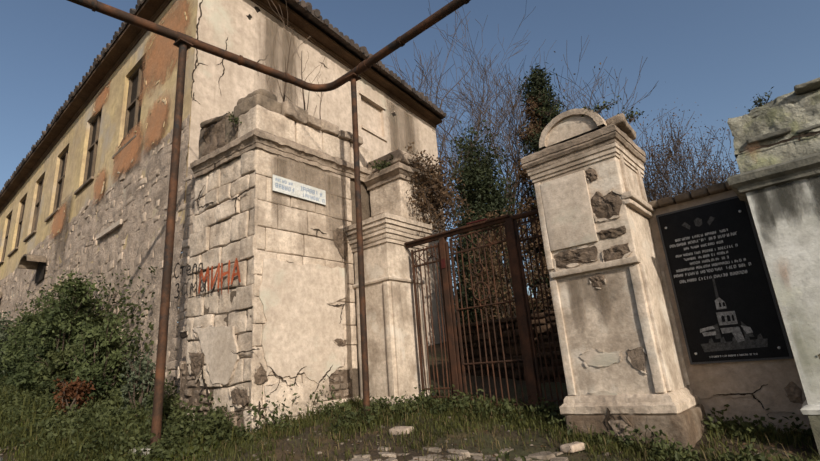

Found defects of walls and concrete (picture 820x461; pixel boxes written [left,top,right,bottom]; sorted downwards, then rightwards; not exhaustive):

flaking render [139,0,189,100]
crack [191,0,228,104]
flaking render [51,204,65,238]
flaking render [94,96,168,202]
spalling [585,166,598,182]
spalling [553,187,633,271]
crack [738,131,820,154]
damp [754,175,820,227]
flaking render [177,225,353,431]
crack [231,348,335,426]
peeling [579,346,647,374]
crack [716,384,768,409]